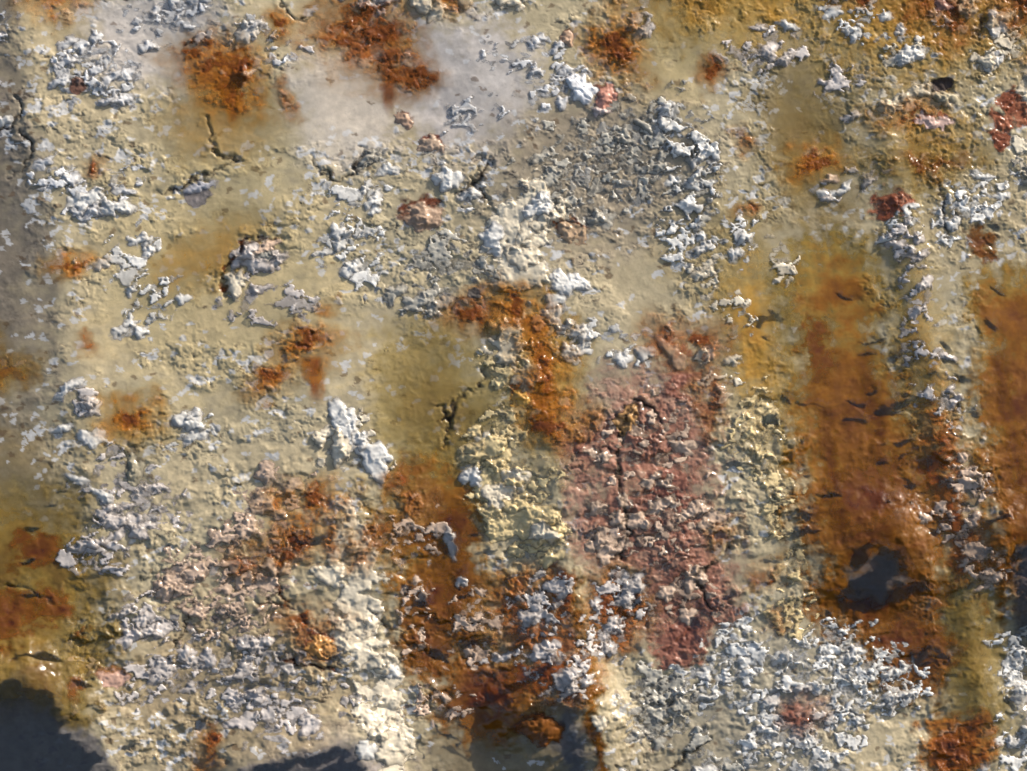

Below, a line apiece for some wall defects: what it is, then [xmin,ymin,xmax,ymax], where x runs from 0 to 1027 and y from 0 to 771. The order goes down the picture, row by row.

rust [181,38,265,116]
rust [308,0,439,102]
rust [583,17,642,74]
peeling [627,6,656,41]
peeling [714,19,810,74]
rust [994,0,1027,34]
crack [0,100,34,168]
peeling [311,32,934,771]
rust [773,225,1027,705]
rust [254,282,747,771]
peeling [50,378,477,771]
rust [913,709,998,771]